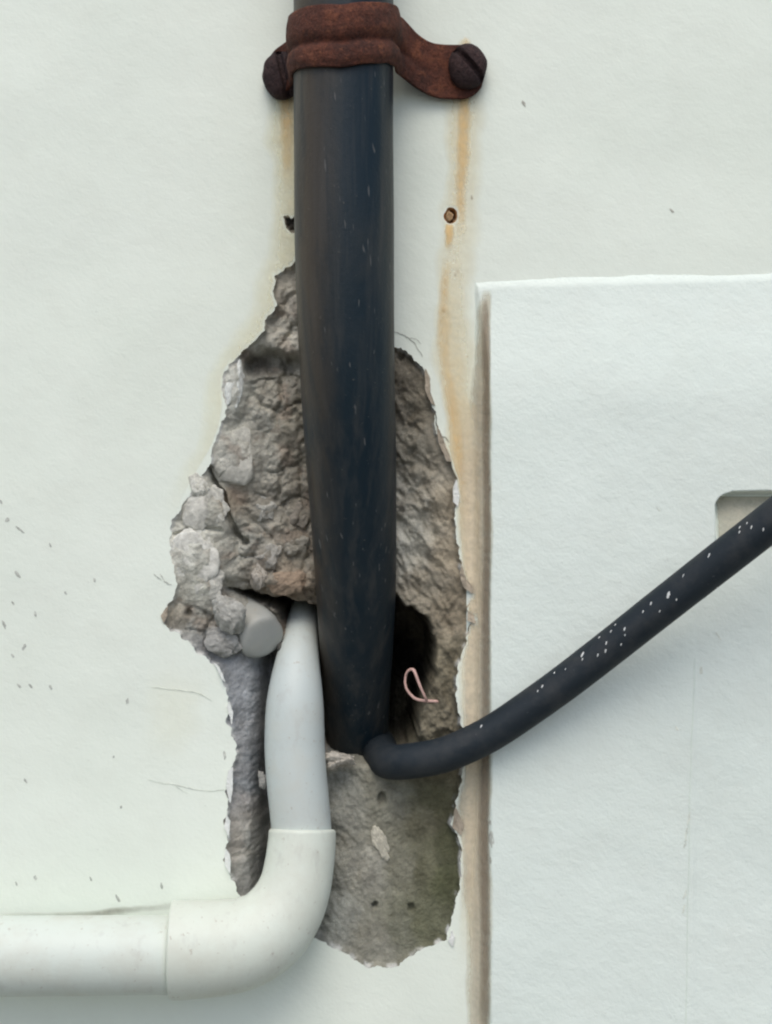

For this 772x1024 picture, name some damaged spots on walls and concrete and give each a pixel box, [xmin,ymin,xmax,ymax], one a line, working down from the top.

spalling [161,262,317,897]
spalling [389,347,476,744]
spalling [314,728,464,968]